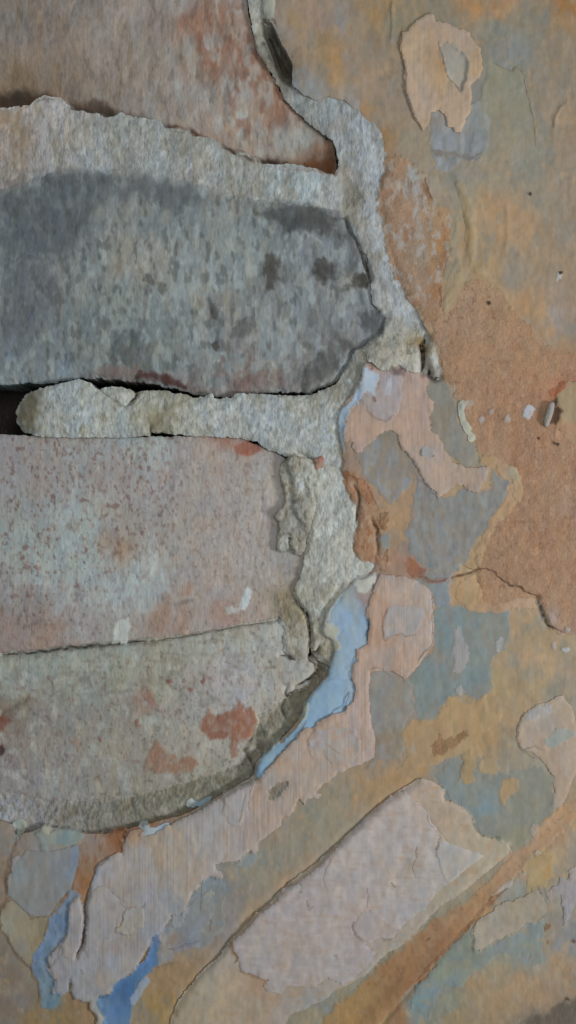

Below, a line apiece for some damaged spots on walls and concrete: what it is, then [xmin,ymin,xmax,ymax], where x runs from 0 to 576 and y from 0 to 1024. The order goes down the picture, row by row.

peeling [399,14,490,173]
flaking render [336,153,576,636]
crack [3,620,277,656]
crack [421,565,566,634]
peeling [0,570,576,1024]